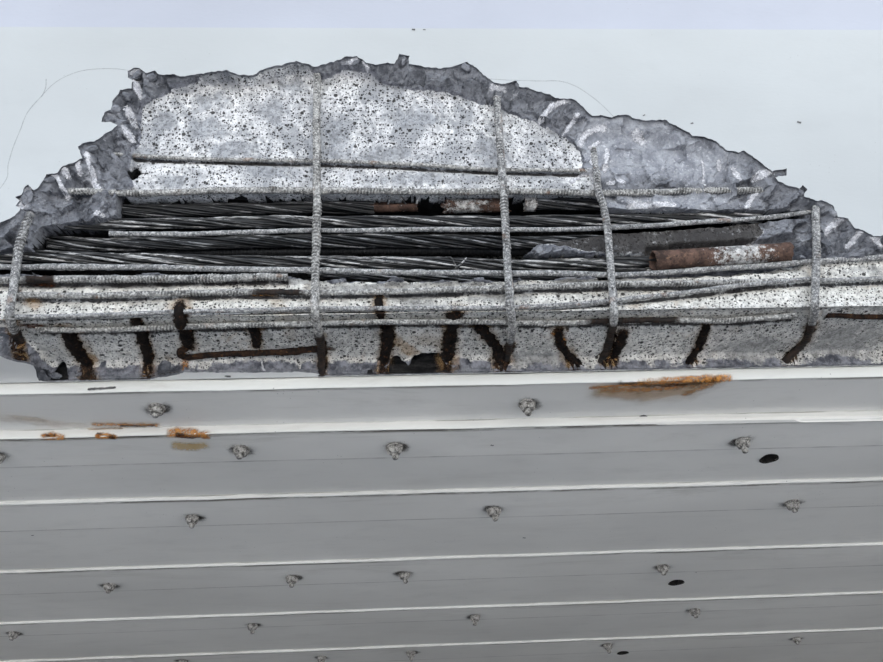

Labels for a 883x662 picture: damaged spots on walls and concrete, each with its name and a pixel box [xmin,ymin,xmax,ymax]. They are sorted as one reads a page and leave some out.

spalling [0,55,883,390]
corrosion [590,375,731,396]
corrosion [92,423,158,439]
corrosion [168,428,210,450]